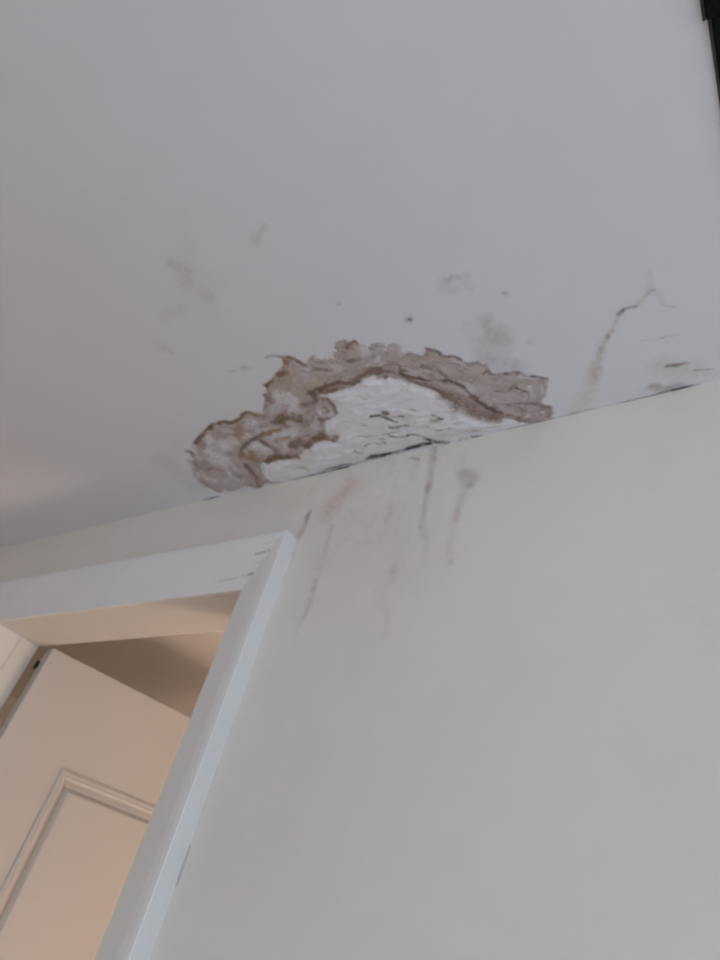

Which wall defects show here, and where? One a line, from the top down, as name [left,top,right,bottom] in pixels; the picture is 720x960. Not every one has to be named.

peeling [185,340,552,492]